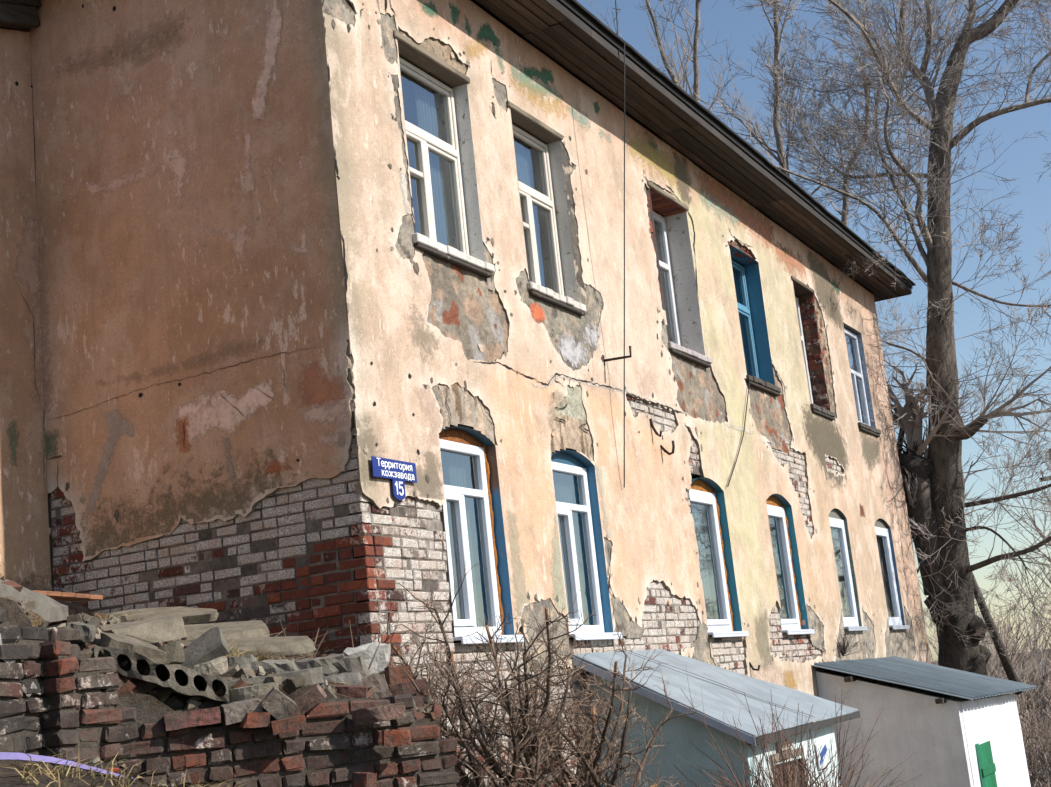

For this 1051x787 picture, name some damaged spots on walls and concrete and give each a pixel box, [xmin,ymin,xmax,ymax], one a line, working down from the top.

flaking render [323,0,364,33]
flaking render [369,11,603,461]
flaking render [642,171,657,266]
crack [17,283,319,496]
crack [474,361,684,451]
flaking render [625,307,726,516]
flaking render [744,368,817,537]
flaking render [812,294,837,433]
flaking render [51,427,749,787]
flaking render [767,597,915,663]